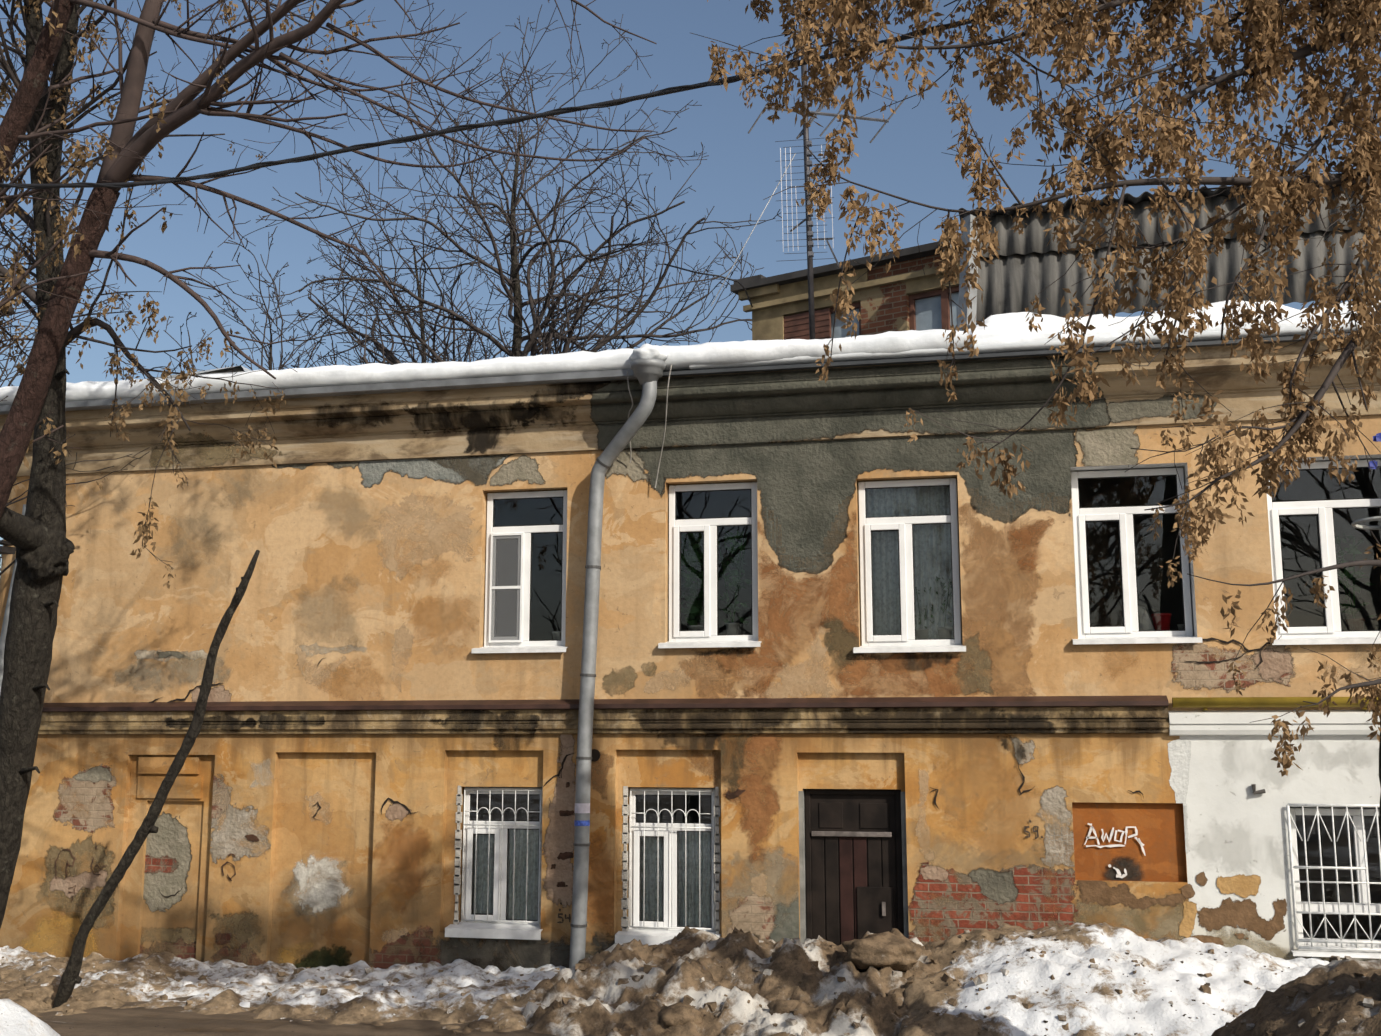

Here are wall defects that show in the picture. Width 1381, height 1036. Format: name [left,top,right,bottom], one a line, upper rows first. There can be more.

water stain [149,433,282,469]
spalling [271,454,546,488]
water stain [316,380,618,454]
spalling [590,355,1219,574]
peeling [115,649,230,690]
spalling [1171,643,1296,693]
peeling [23,763,118,957]
spalling [140,811,312,966]
spalling [210,774,271,864]
peeling [283,855,352,915]
spalling [542,734,576,908]
spalling [908,785,1287,946]